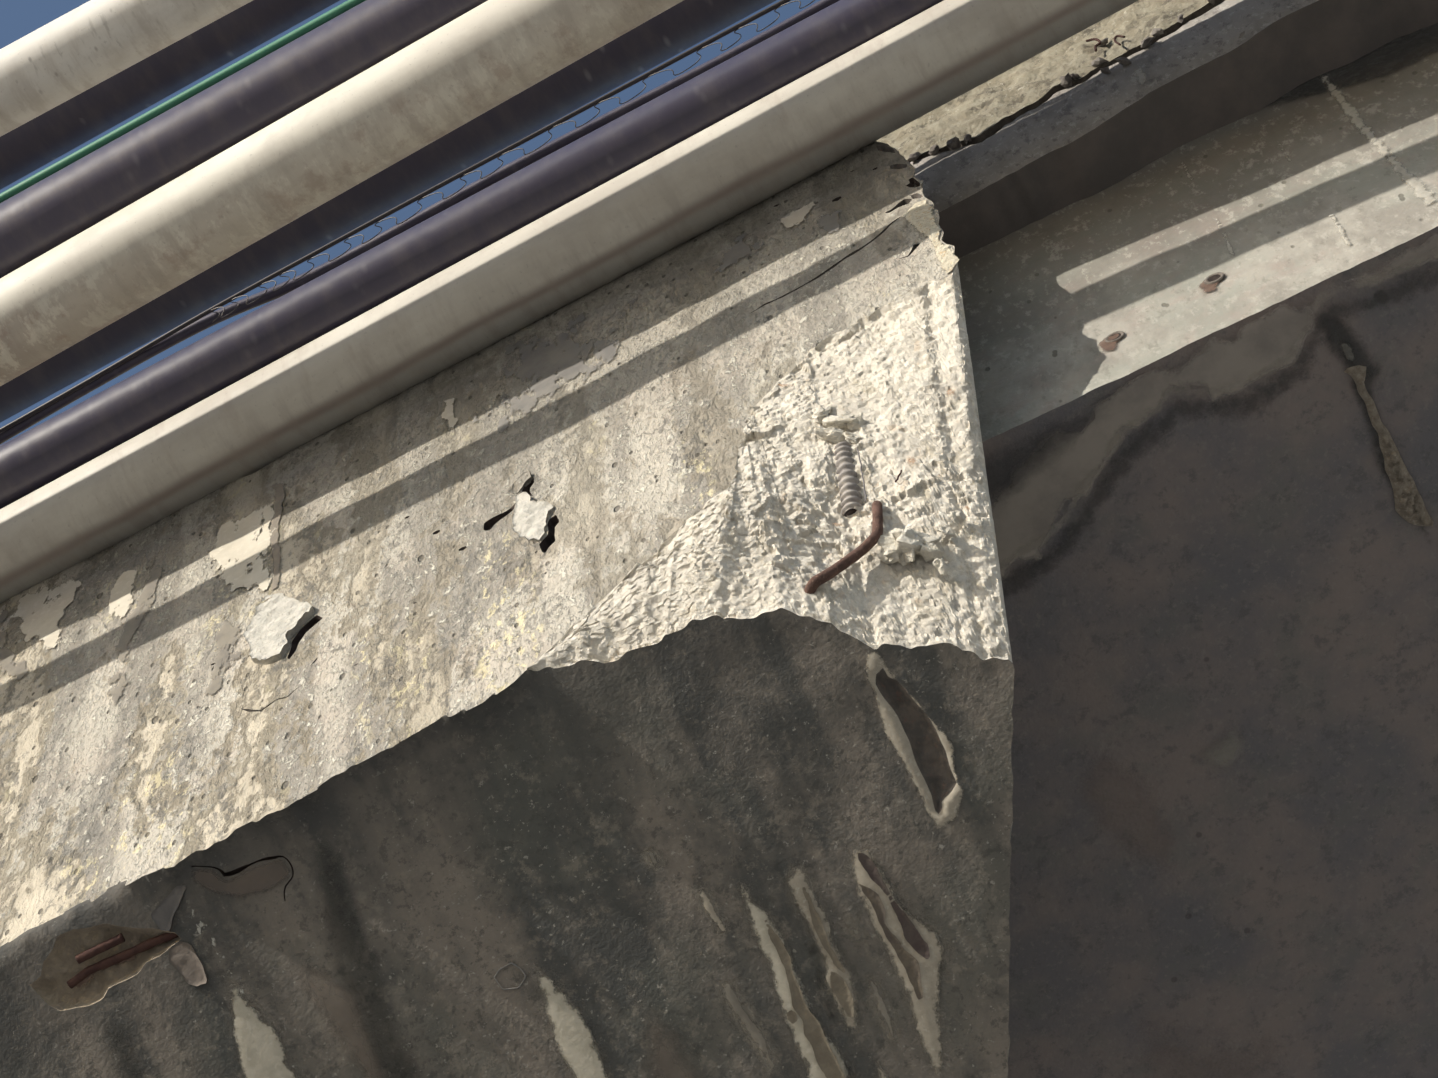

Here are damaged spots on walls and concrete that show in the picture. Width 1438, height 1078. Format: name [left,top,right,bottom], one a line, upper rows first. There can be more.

crack [907,0,1224,162]
peeling [484,471,559,553]
spalling [527,145,1012,671]
crack [751,217,917,313]
rust [1099,332,1125,351]
leakage [986,306,1433,578]
rust [1199,272,1225,292]
peeling [206,503,322,665]
spalling [30,885,209,1011]
leakage [212,938,295,1078]
leakage [540,977,607,1078]
leakage [788,849,942,1067]